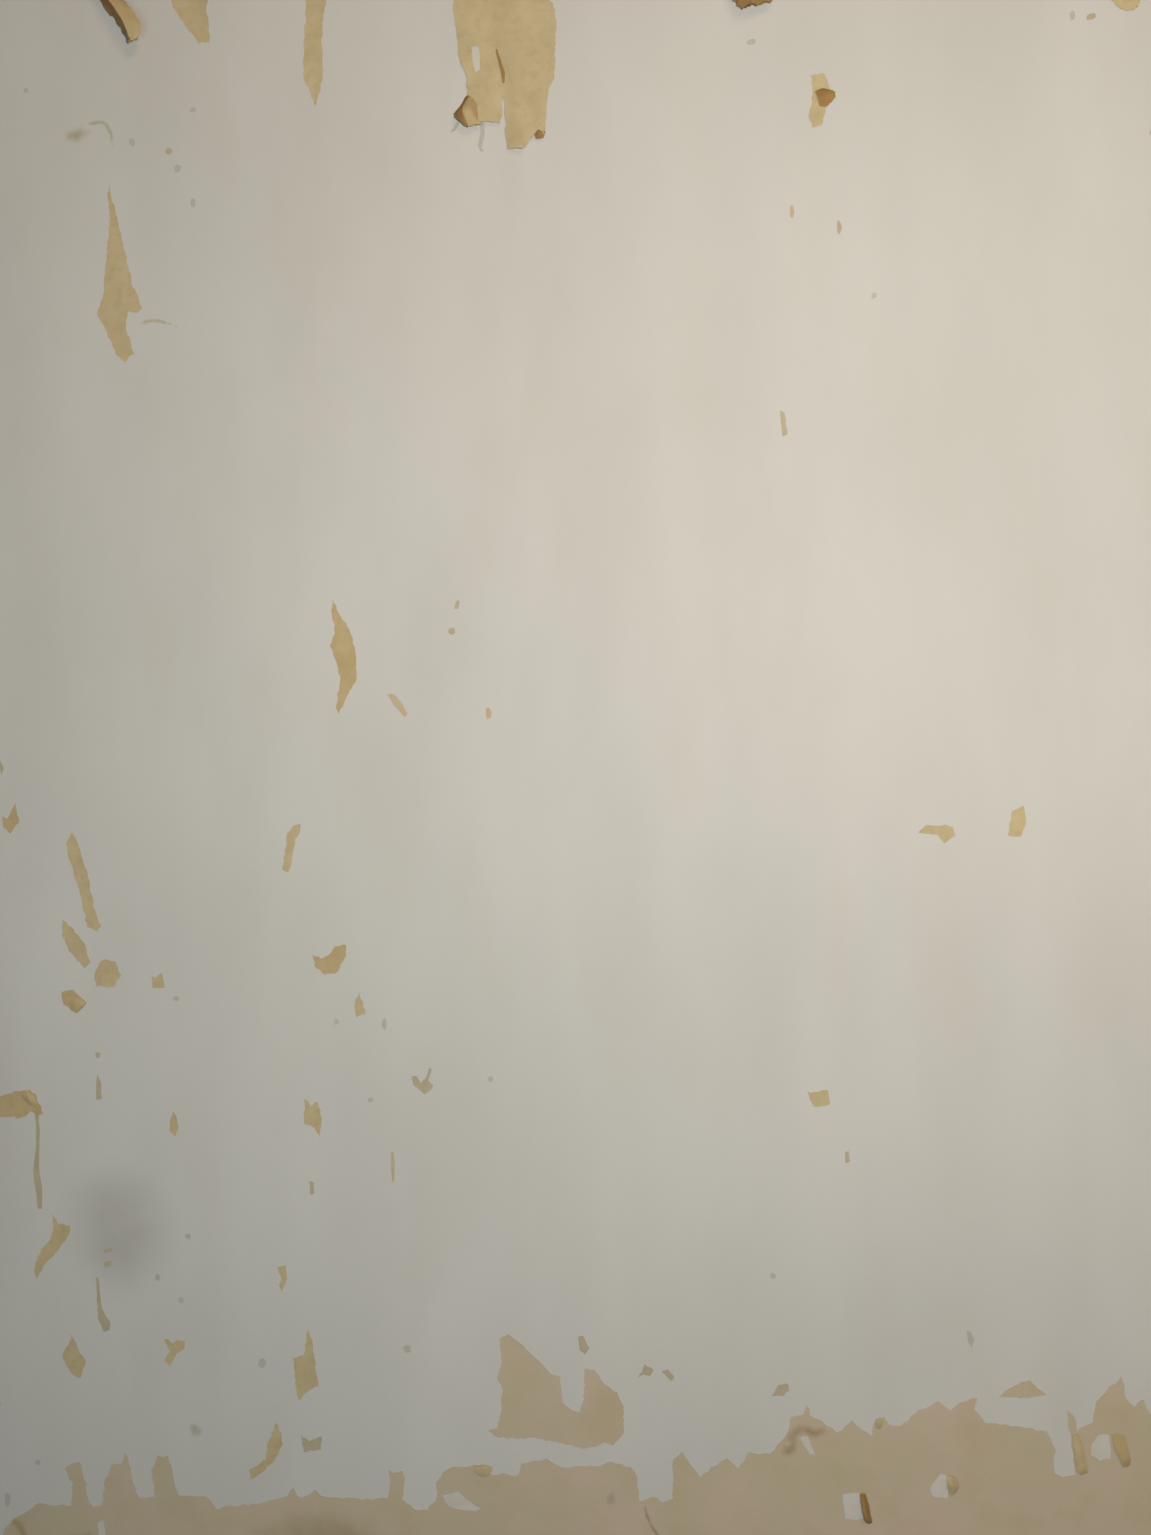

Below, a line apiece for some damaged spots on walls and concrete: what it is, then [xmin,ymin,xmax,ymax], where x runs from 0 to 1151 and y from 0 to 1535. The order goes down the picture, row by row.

flaking render [1092,1436,1109,1458]
flaking render [932,1475,946,1496]
flaking render [844,1495,863,1518]